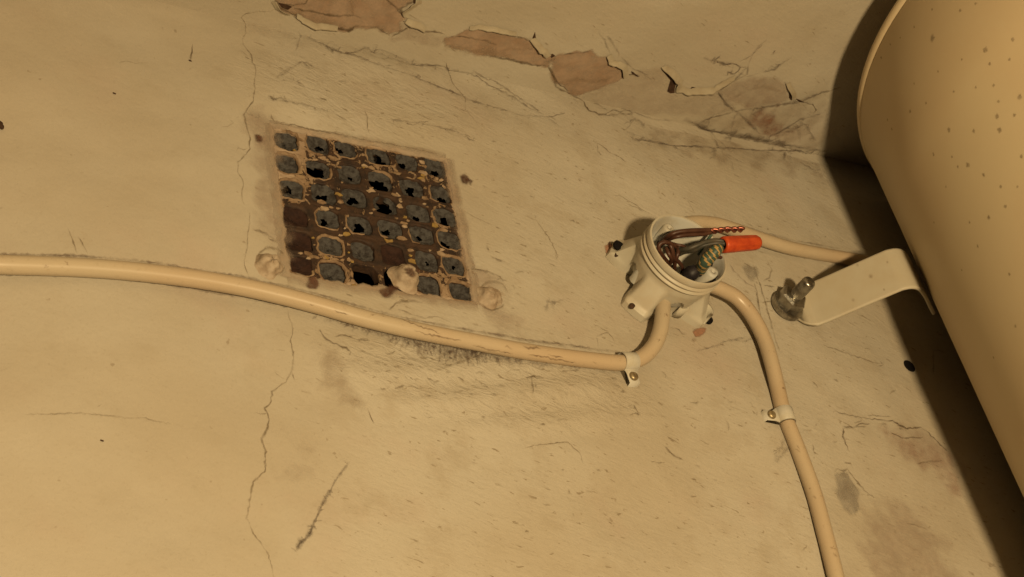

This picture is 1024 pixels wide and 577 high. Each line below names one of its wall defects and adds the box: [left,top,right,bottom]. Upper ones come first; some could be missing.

peeling [272,0,639,96]
peeling [661,65,736,100]
corrosion [380,286,399,297]